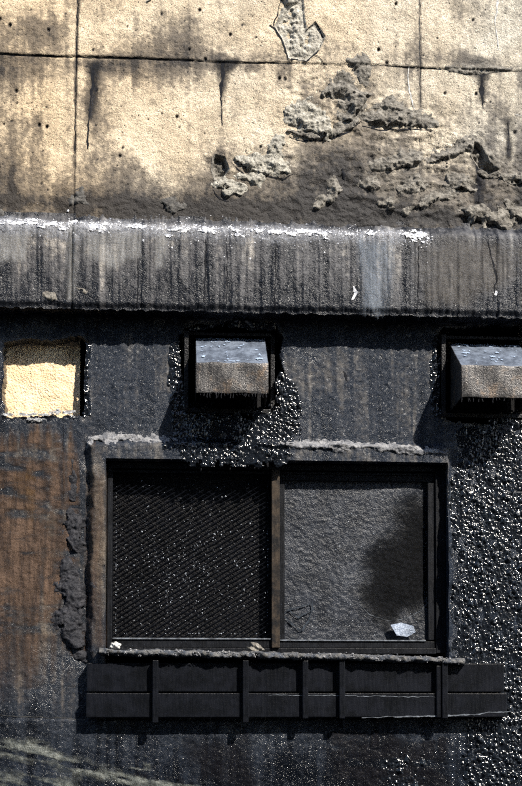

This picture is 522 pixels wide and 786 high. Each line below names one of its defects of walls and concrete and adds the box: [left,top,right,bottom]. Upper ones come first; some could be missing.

spalling [269,0,326,67]
spalling [445,60,514,75]
peeling [211,134,291,198]
damp [0,218,409,264]
peeling [0,186,433,255]
crack [488,241,498,301]
spalling [2,408,76,422]